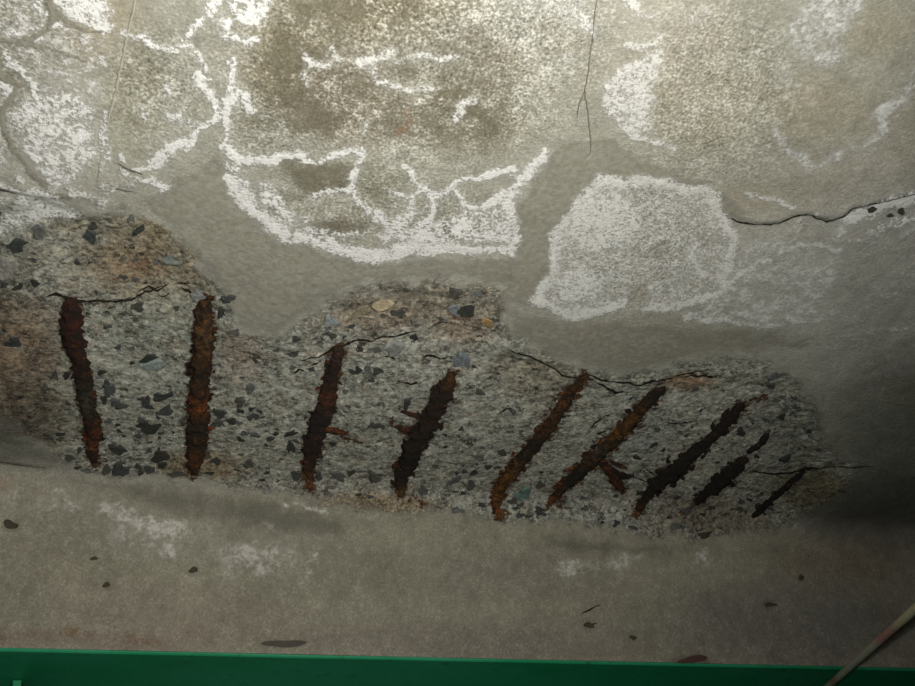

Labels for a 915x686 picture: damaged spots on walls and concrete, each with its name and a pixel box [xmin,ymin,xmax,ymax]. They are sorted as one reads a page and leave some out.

crack [0,0,104,200]
water stain [0,0,915,367]
crack [725,196,905,228]
spalling [0,196,858,544]
rust [486,369,593,522]